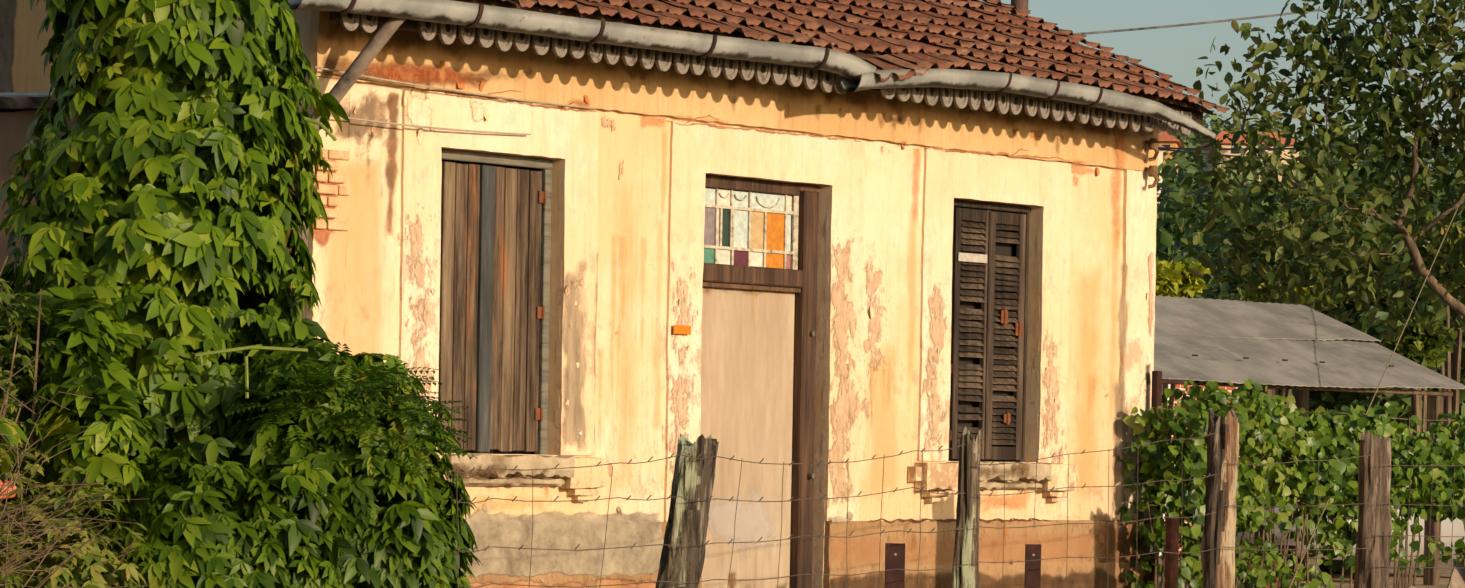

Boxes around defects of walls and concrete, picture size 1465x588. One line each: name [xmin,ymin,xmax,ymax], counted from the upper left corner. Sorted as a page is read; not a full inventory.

water stain [0,0,16,93]
flaking render [313,149,350,245]
water stain [324,22,489,232]
water stain [601,56,901,125]
water stain [951,101,1145,239]
peeling [563,263,586,447]
peeling [828,236,886,523]
water stain [830,572,885,588]
water stain [905,573,952,588]
water stain [979,511,1146,588]